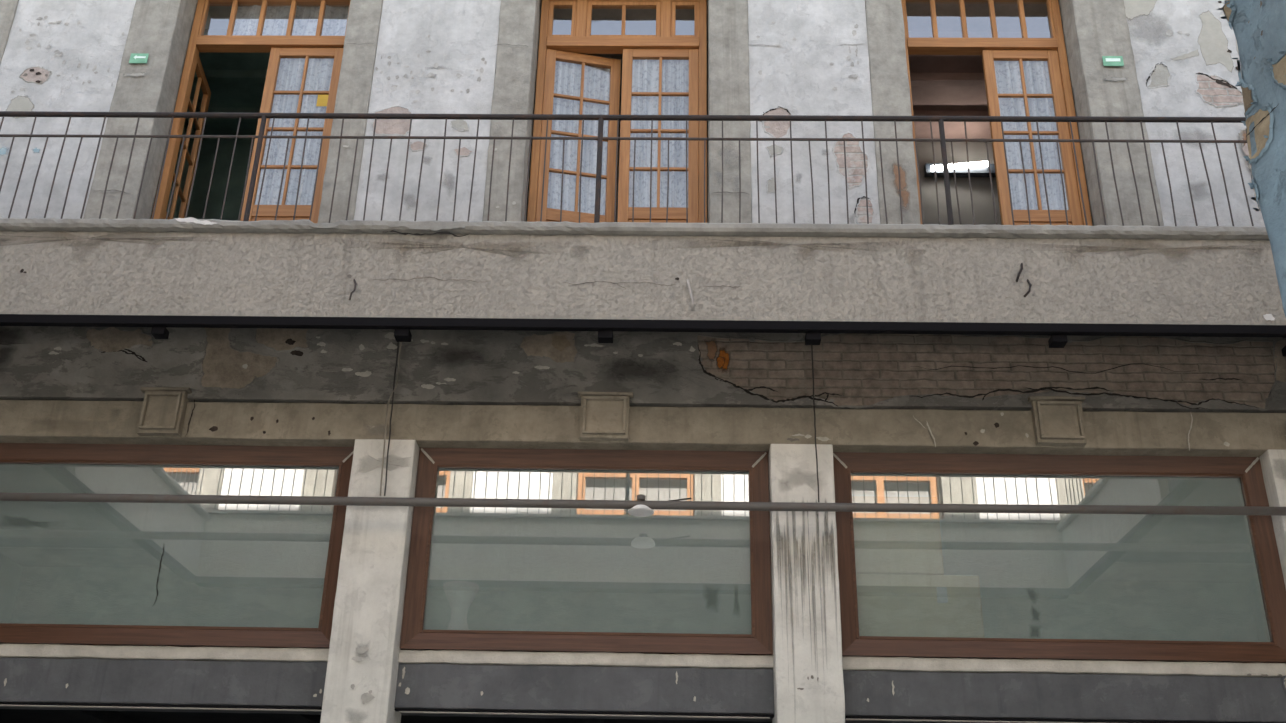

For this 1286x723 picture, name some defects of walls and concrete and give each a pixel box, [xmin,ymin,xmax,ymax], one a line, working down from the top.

peeling [11,16,113,97]
peeling [371,35,439,152]
peeling [450,120,473,157]
peeling [832,131,875,224]
peeling [1146,62,1171,89]
peeling [1216,0,1263,36]
peeling [1195,49,1286,211]
crack [698,345,842,406]
crack [910,363,1257,450]
leakage [776,502,836,634]